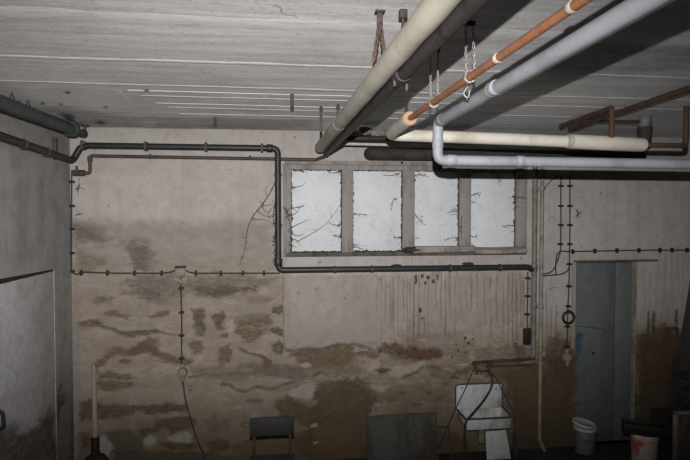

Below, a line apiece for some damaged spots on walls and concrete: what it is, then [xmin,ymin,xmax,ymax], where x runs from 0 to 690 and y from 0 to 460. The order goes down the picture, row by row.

leakage [95,309,272,391]
leakage [78,342,376,460]
leakage [446,337,577,449]